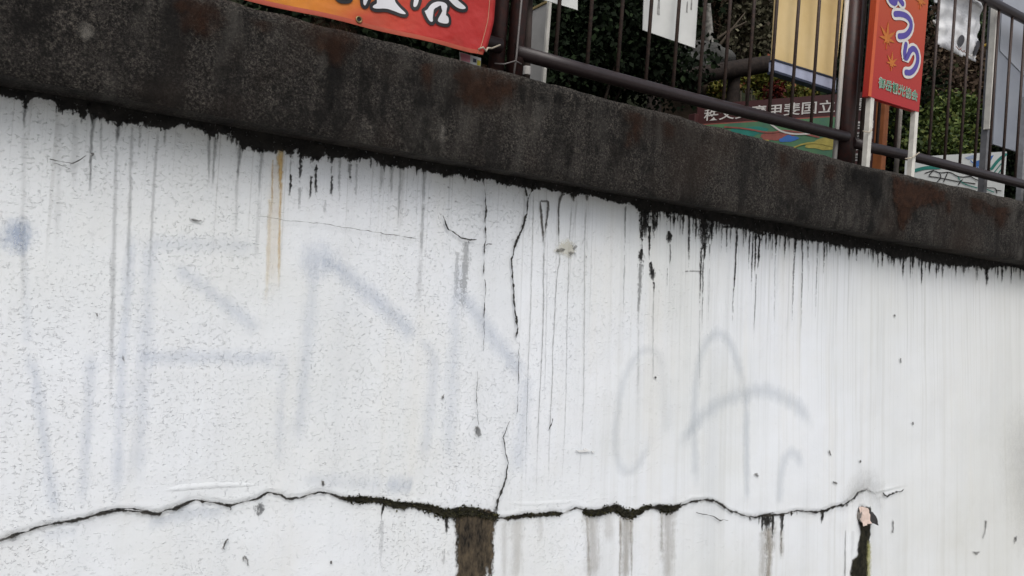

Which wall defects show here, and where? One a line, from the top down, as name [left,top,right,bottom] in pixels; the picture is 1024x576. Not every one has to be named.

damp [0,86,1024,305]
crack [0,184,904,542]
damp [444,509,497,576]
damp [850,520,871,576]